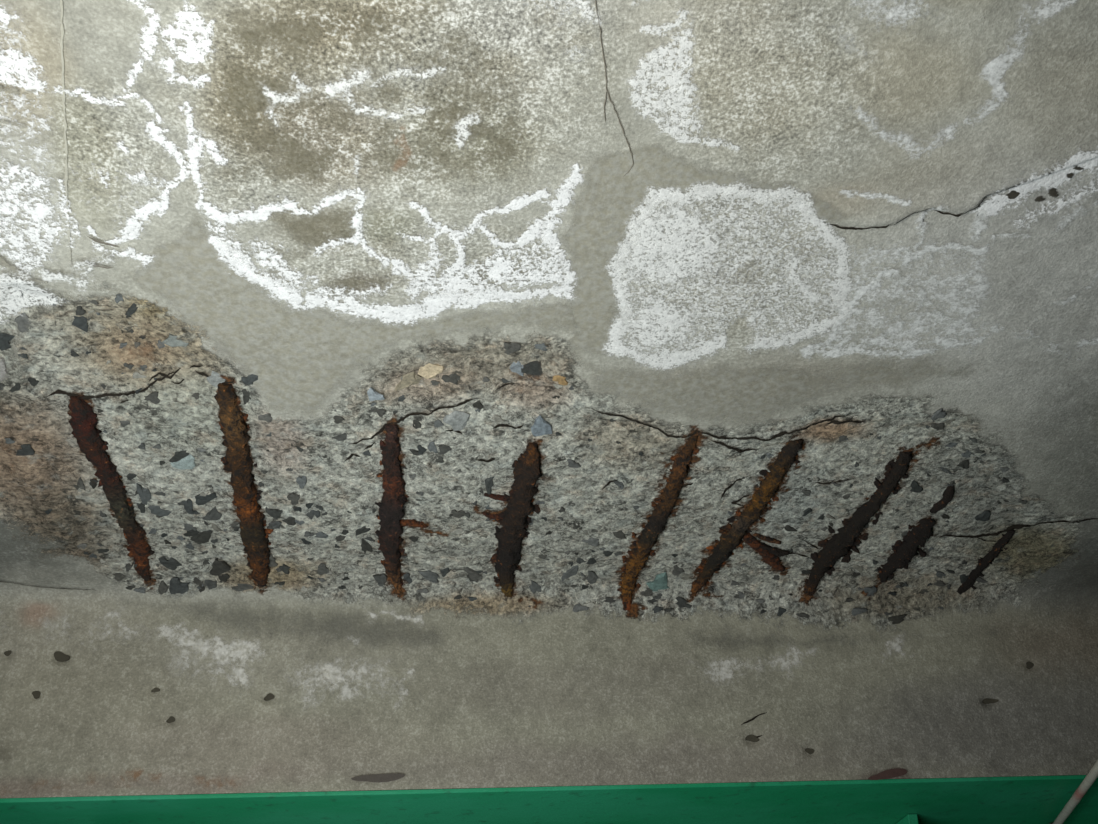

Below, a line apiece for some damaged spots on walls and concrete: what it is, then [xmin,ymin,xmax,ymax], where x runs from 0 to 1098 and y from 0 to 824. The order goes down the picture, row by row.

crack [0,86,36,94]
water stain [0,0,1098,421]
crack [819,173,1052,230]
crack [0,257,48,284]
rust [379,415,407,498]
spalling [0,282,1081,631]
rust [880,437,941,492]
rust [385,517,449,601]
rust [495,579,544,609]
rust [615,425,708,619]
rust [687,435,817,605]